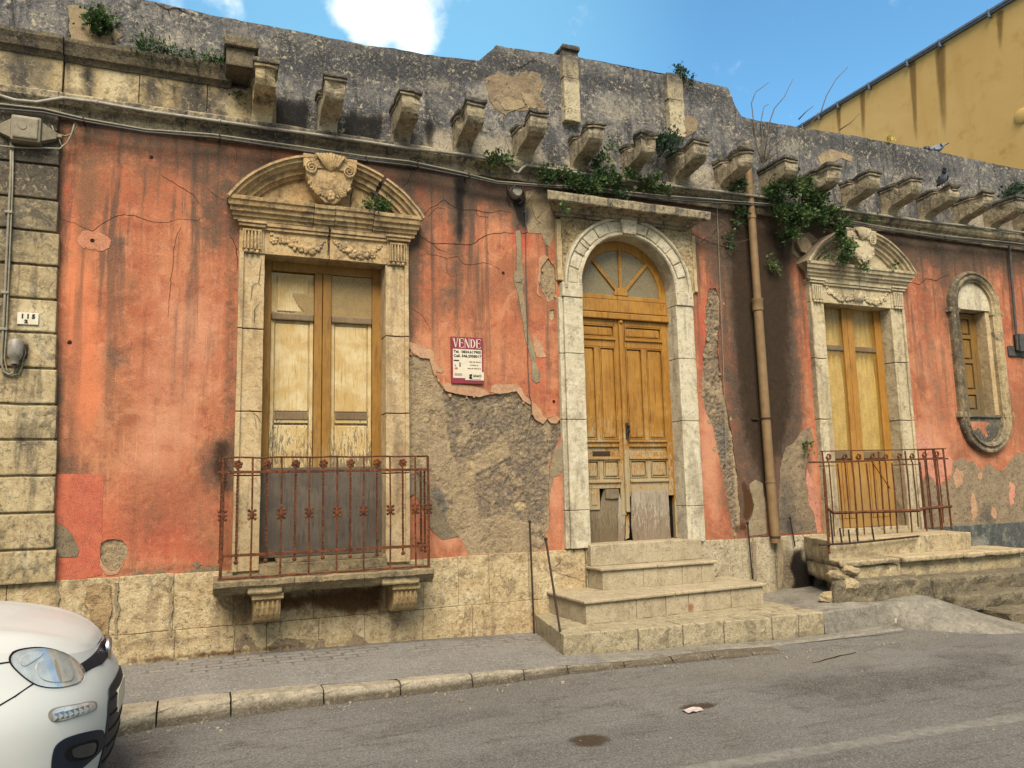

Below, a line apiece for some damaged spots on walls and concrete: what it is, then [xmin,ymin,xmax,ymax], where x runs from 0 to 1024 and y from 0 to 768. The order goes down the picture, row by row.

spalling [484,70,546,115]
crack [62,173,223,312]
crack [417,199,543,277]
flaking render [526,188,558,321]
flaking render [407,342,562,555]
peeling [533,333,546,358]
flaking render [699,288,741,537]
leakage [736,482,753,531]
leakage [732,226,789,481]
flaking render [921,452,1024,528]